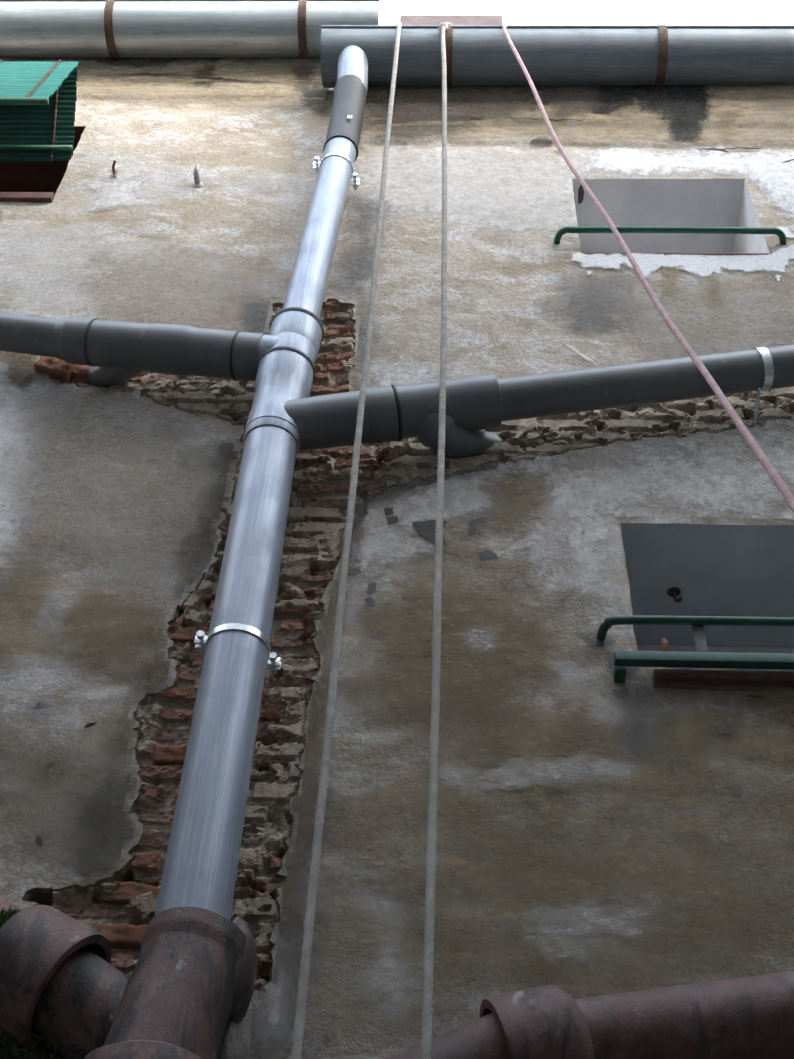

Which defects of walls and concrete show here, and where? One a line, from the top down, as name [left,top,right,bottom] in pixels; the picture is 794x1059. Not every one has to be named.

water stain [360,85,794,148]
peeling [570,226,794,281]
water stain [0,351,37,387]
flaking render [33,356,93,388]
flaking render [310,301,354,397]
water stain [176,441,239,592]
water stain [0,539,170,865]
flaking render [51,371,255,977]
flaking render [230,387,794,991]
water stain [253,521,794,1055]